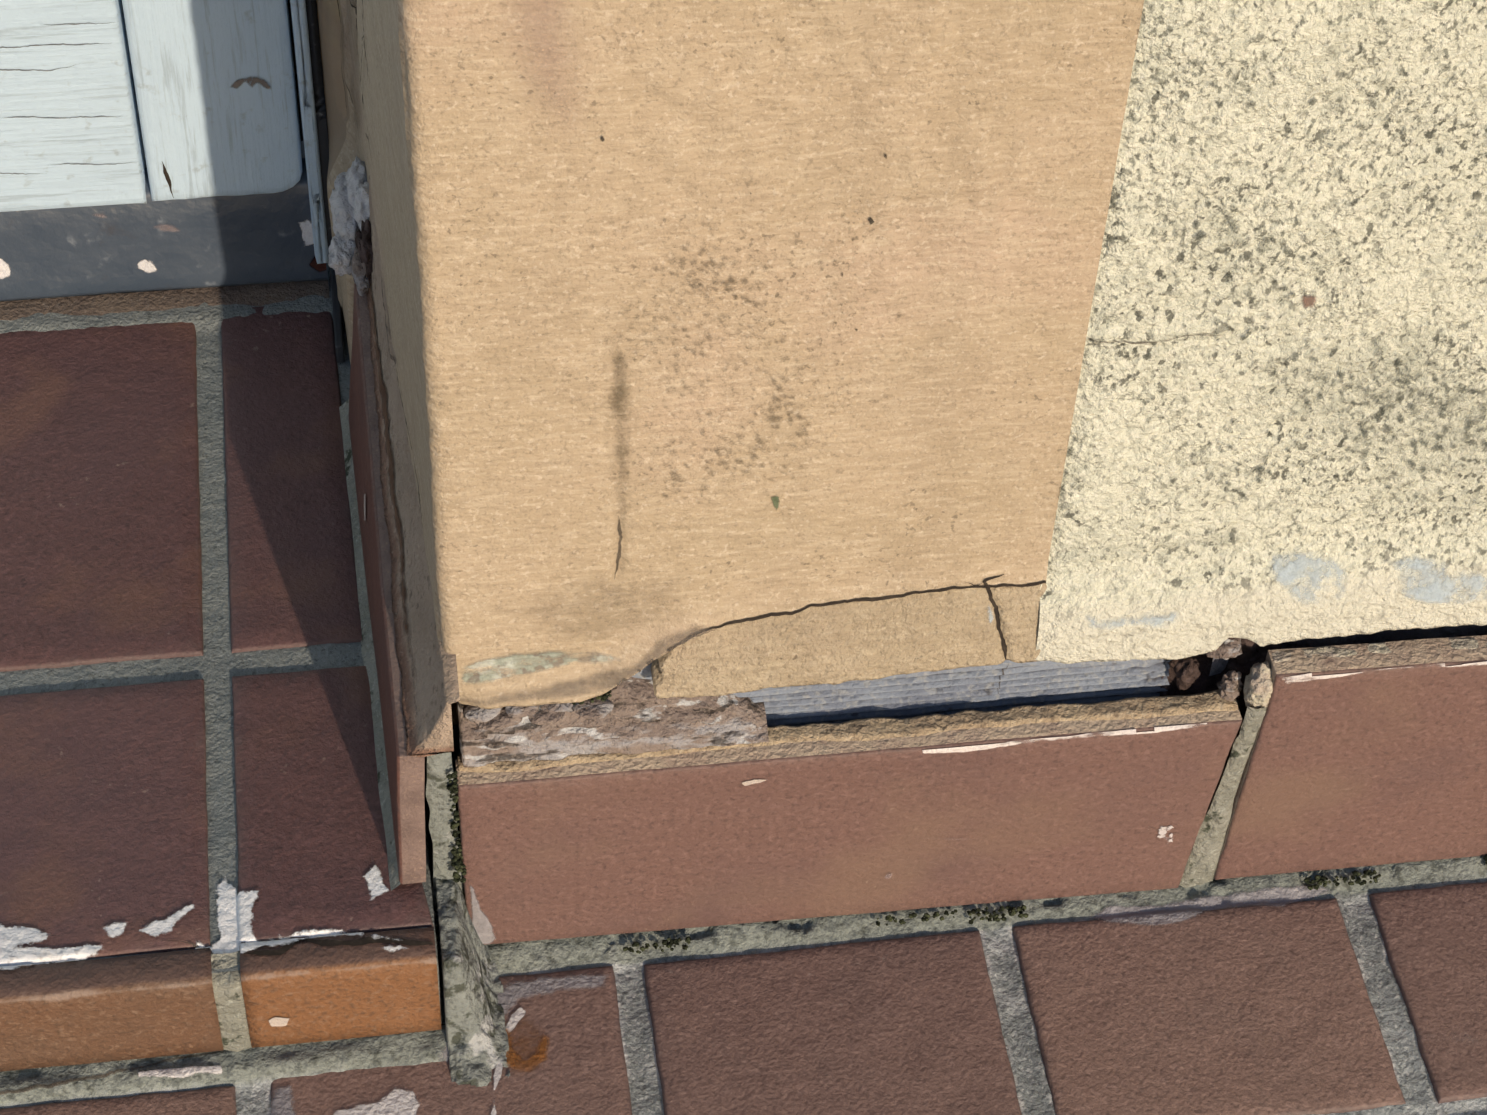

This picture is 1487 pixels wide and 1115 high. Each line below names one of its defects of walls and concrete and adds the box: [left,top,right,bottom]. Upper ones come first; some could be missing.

crack [337,0,371,154]
crack [617,574,1046,694]
spalling [457,625,1487,768]